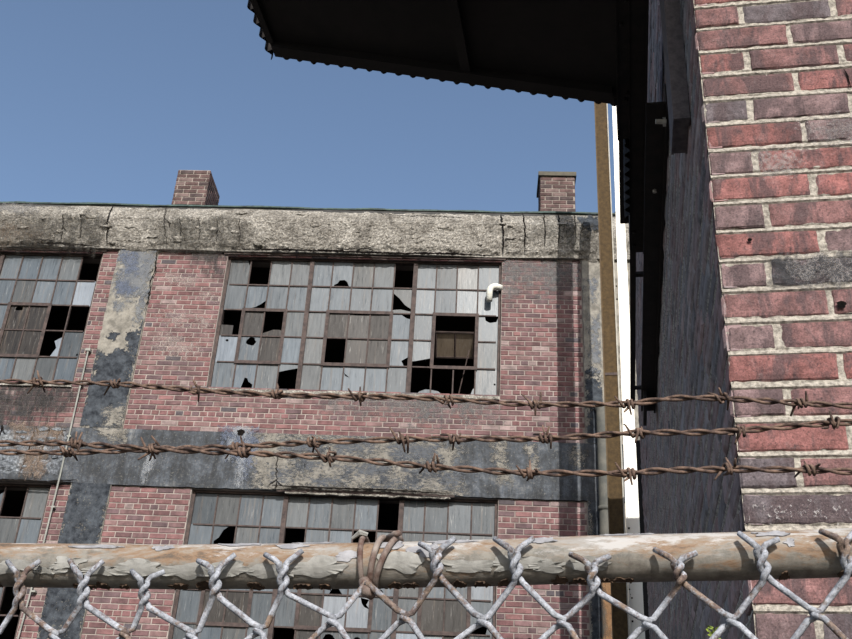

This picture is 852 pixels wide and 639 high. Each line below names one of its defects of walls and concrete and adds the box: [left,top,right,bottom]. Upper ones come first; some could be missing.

crack [145,209,504,308]
crack [522,213,577,251]
damp [217,425,263,480]